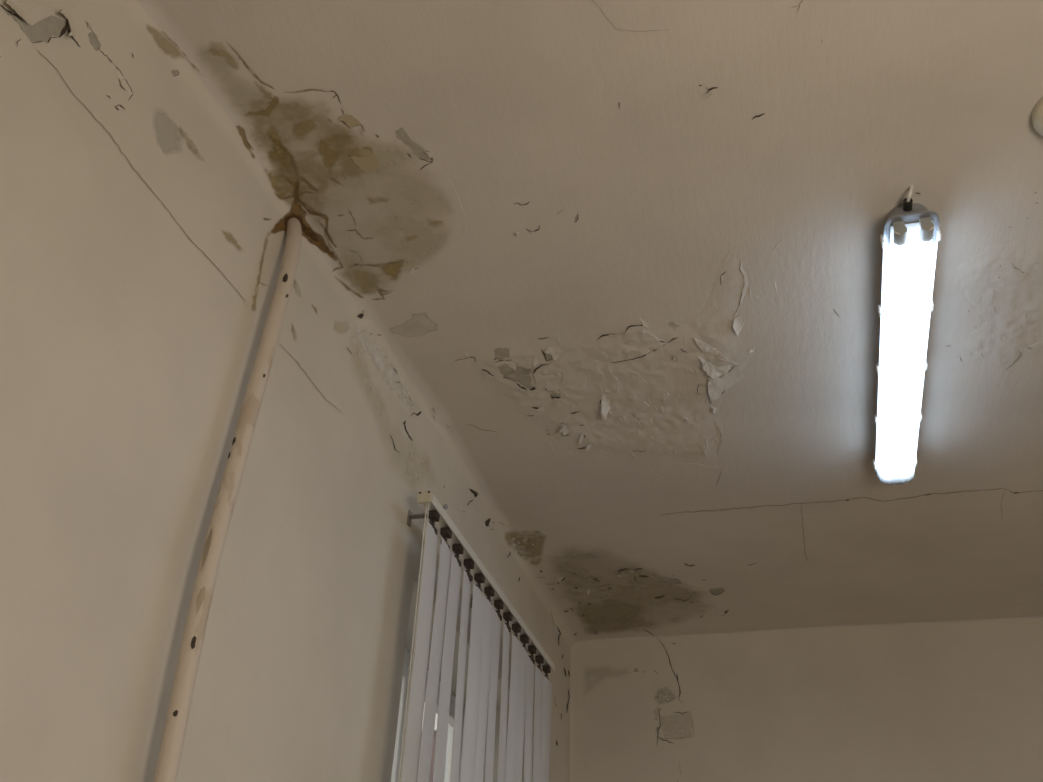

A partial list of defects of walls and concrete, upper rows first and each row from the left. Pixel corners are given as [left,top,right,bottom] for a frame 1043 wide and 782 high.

peeling [1,0,89,46]
crack [37,22,246,301]
damp [211,49,318,205]
damp [329,245,403,300]
peeling [695,339,744,417]
crack [630,420,1043,561]